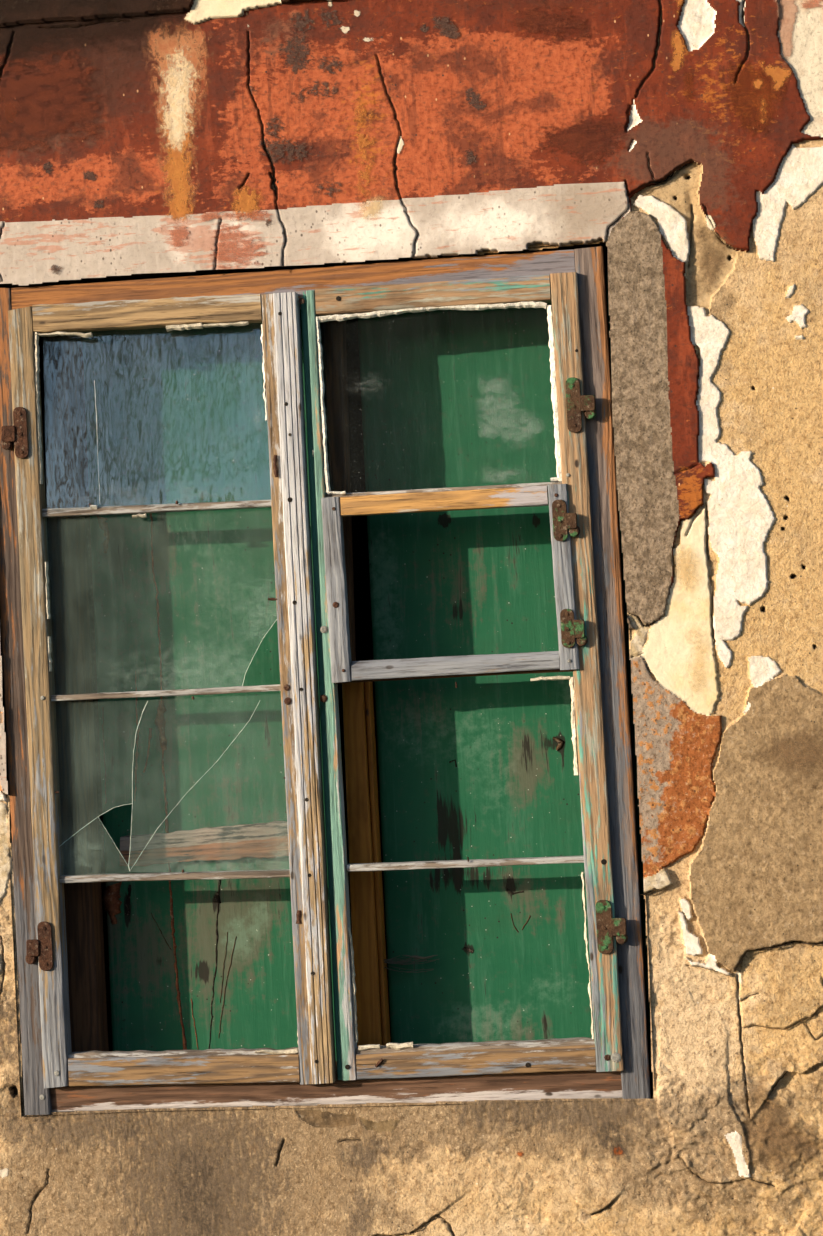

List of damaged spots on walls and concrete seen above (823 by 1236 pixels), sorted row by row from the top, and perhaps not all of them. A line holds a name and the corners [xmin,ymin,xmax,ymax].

leakage [148,23,207,221]
rust [202,186,270,268]
crack [242,34,286,271]
crack [377,59,418,258]
peeling [627,100,643,152]
rust [670,31,692,97]
peeling [677,0,717,51]
rust [728,62,791,132]
peeling [753,0,823,262]
peeling [627,161,790,894]
crack [687,941,823,1111]
leakage [8,1101,289,1236]